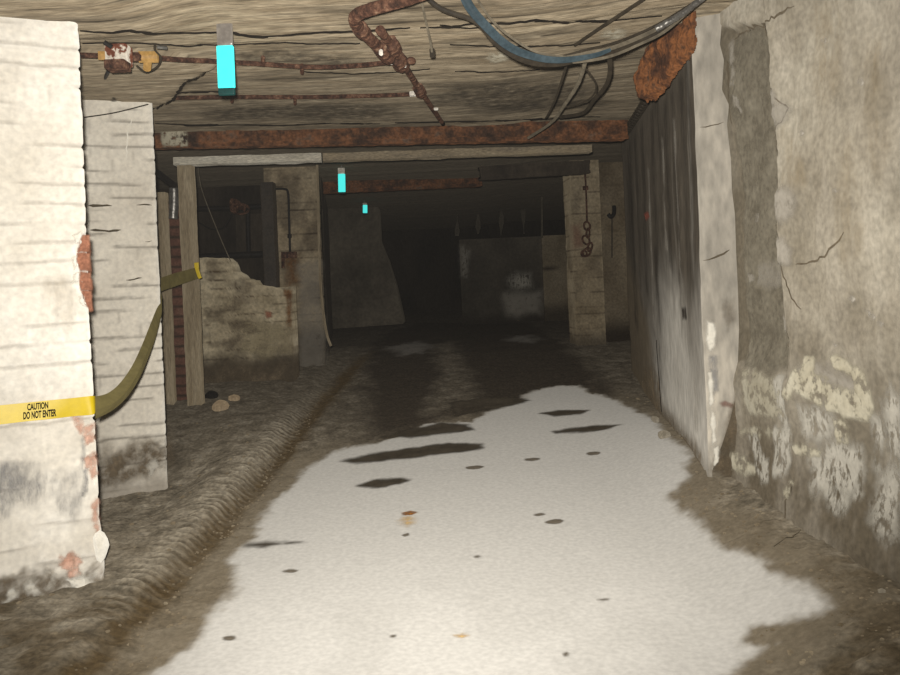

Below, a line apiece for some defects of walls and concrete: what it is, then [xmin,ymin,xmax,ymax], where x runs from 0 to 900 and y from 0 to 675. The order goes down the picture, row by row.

crack [80,15,662,127]
flaking render [72,232,93,311]
crack [780,232,844,309]
peeling [73,417,97,496]
peeling [792,445,821,457]